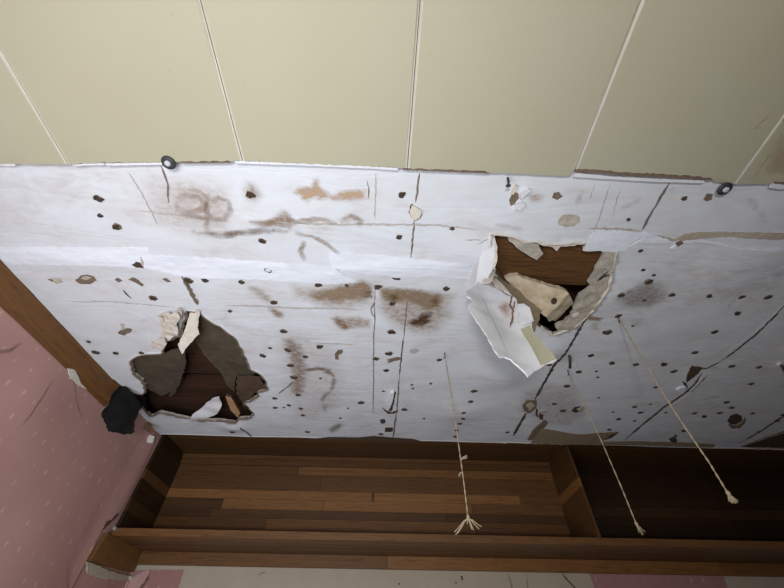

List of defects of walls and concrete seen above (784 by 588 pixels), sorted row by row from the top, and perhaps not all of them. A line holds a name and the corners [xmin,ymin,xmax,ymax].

damp [298,183,363,199]
spalling [508,237,578,260]
damp [309,283,371,304]
damp [382,290,445,327]
spalling [555,252,618,332]
crack [513,319,587,436]
crack [625,305,784,442]